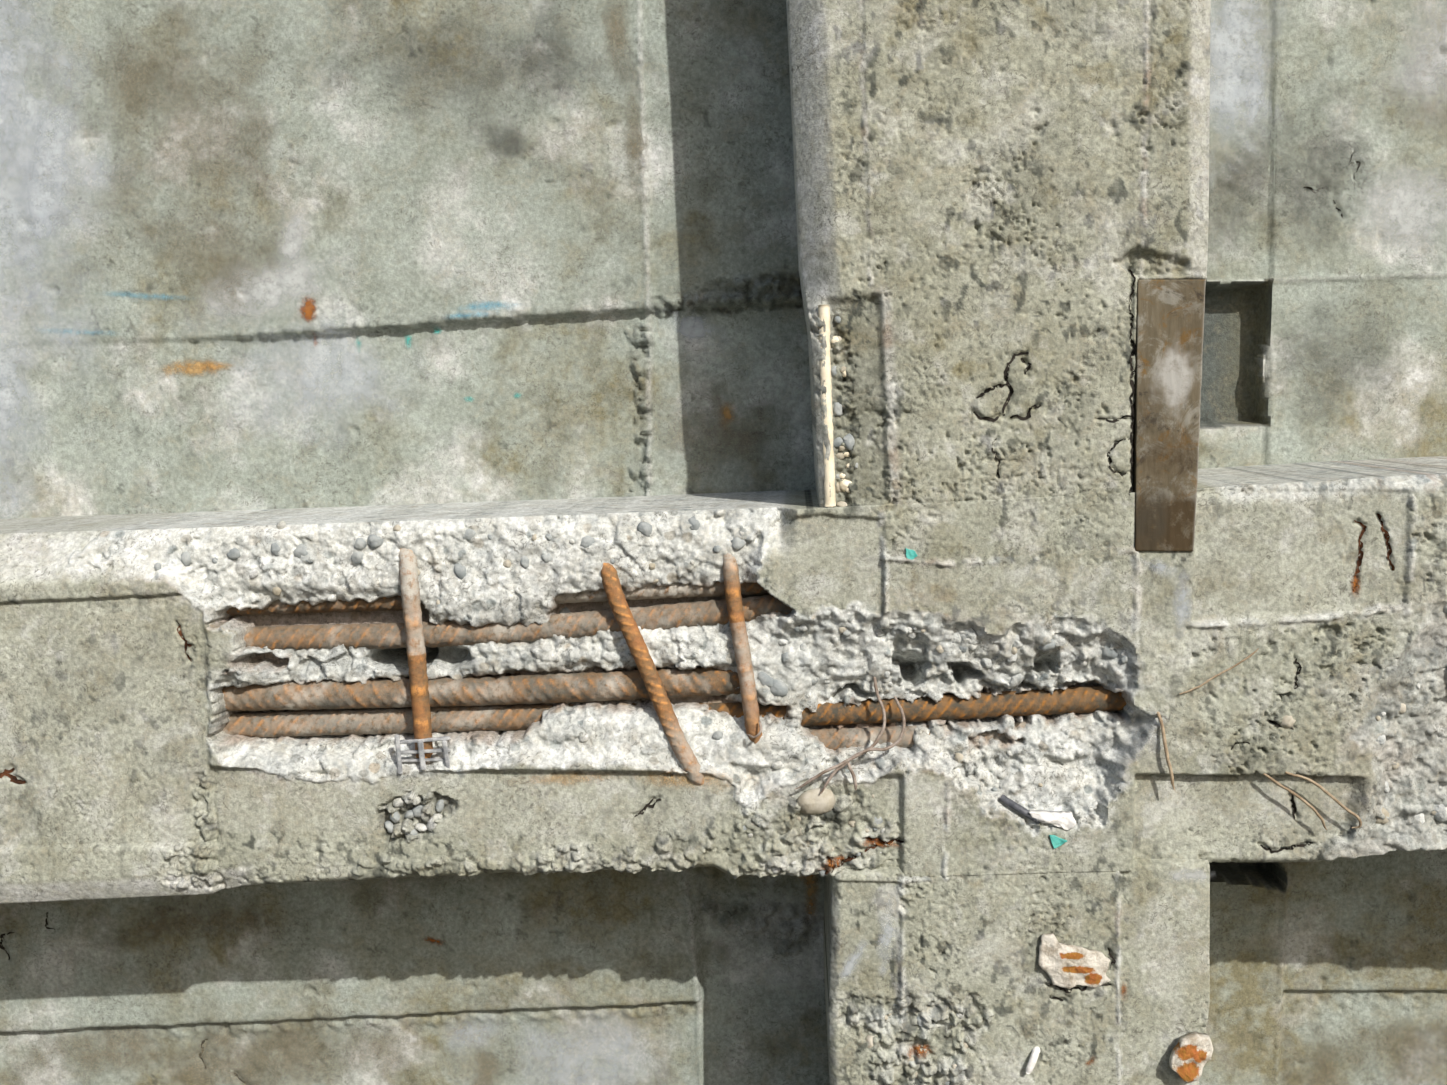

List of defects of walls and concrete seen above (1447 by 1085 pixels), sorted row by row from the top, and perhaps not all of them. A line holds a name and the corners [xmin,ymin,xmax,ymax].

crack [973,352,1041,478]
crack [1097,269,1136,495]
crack [0,767,26,784]
spalling [68,507,1162,849]
spalling [1319,601,1447,861]
crack [198,1039,247,1084]